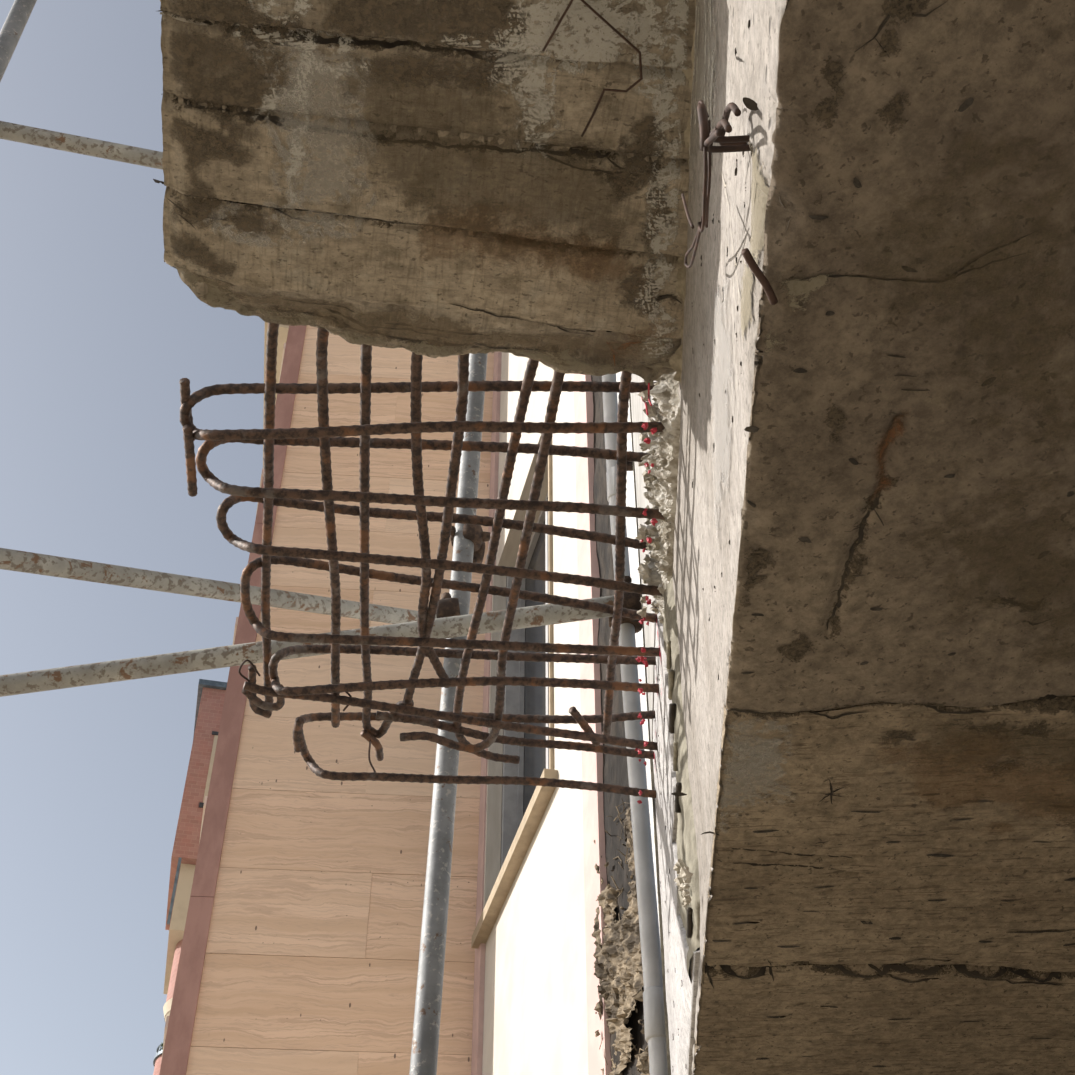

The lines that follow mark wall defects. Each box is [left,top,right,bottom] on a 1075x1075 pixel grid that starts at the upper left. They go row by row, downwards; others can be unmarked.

crack [159,10,579,66]
crack [171,94,616,172]
leakage [170,0,714,358]
spalling [171,264,729,982]
crack [729,694,1075,722]
crack [662,730,1075,988]